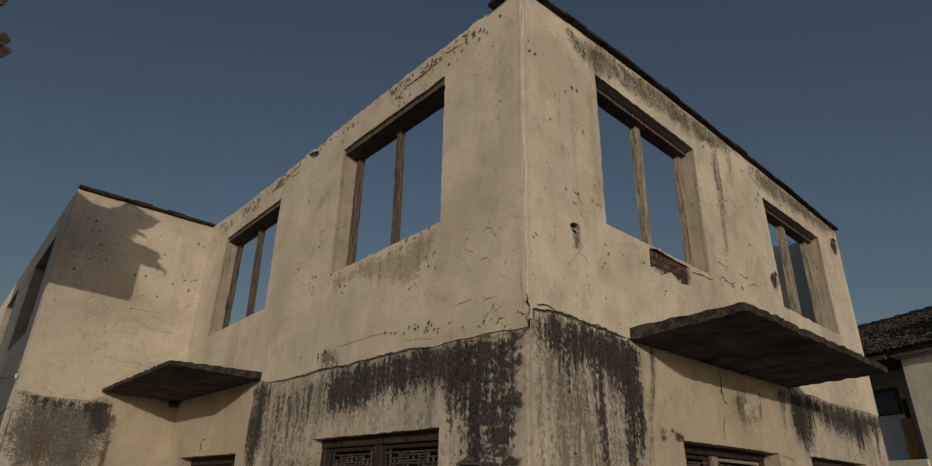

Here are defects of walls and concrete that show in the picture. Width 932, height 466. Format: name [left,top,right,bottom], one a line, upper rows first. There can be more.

crack [456,223,625,345]
flaking render [642,246,692,285]
leakage [3,391,116,466]
leakage [317,330,522,466]
leakage [533,312,655,466]
leakage [779,388,882,459]